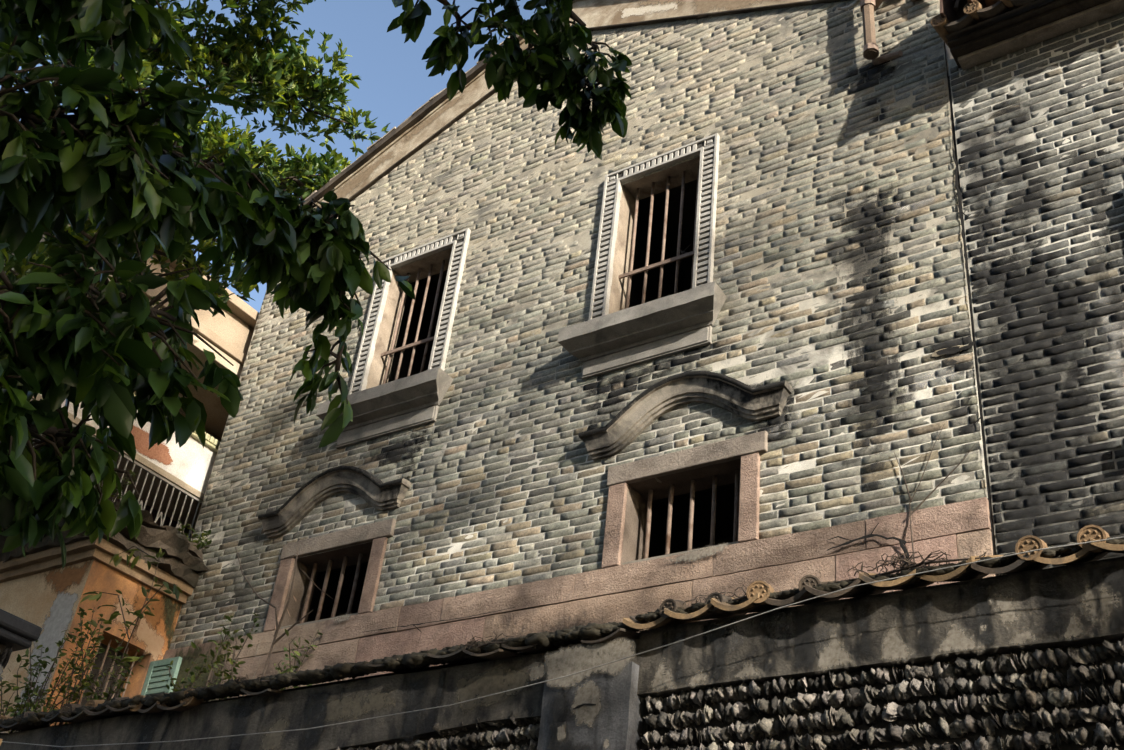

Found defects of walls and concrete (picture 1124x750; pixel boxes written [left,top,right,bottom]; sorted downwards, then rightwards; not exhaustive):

leakage [917,94,1124,555]
flaking render [131,425,173,465]
leakage [751,610,816,673]
leakage [842,603,872,658]
leakage [899,595,936,655]
leakage [958,583,997,647]
leakage [1089,552,1124,634]
flaking render [456,639,635,740]